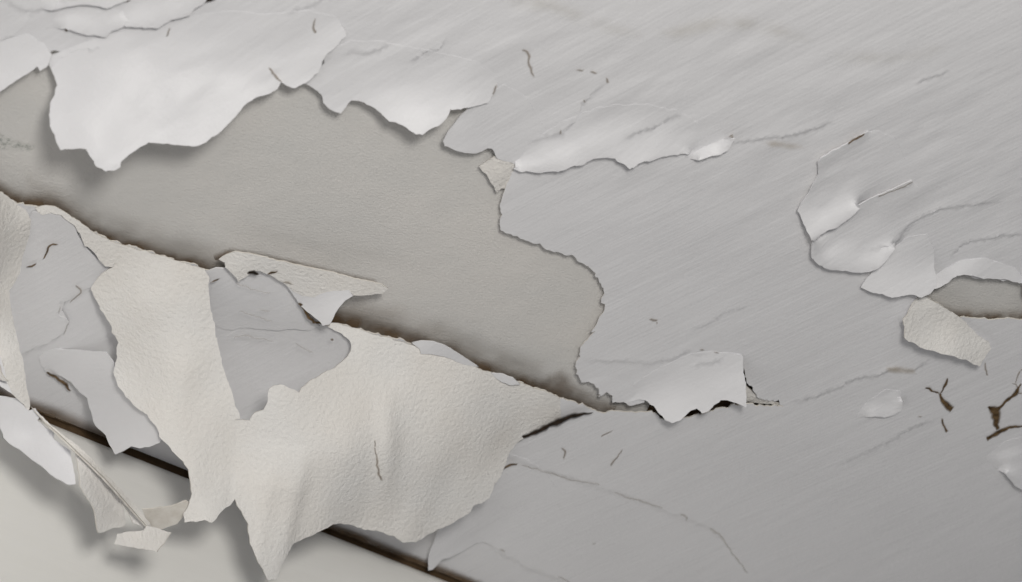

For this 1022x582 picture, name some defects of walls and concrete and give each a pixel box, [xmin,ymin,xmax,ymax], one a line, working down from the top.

peeling [0,0,780,580]
peeling [797,130,1022,366]
crack [925,379,954,432]
crack [986,372,1022,441]